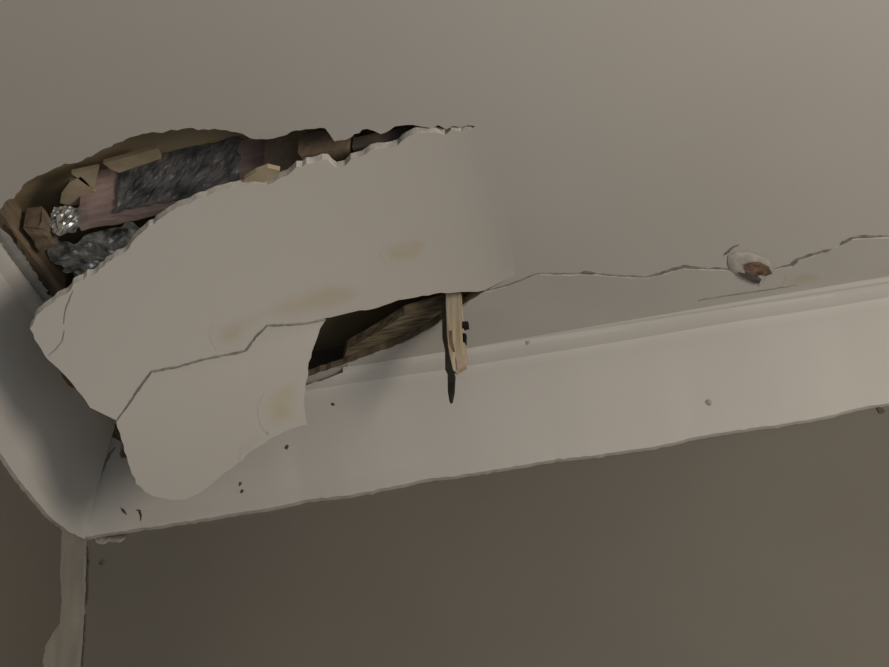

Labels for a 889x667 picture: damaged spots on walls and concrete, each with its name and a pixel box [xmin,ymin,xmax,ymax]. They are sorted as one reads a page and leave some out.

crack [487,265,729,291]
crack [698,235,889,301]
flaking render [30,125,515,500]